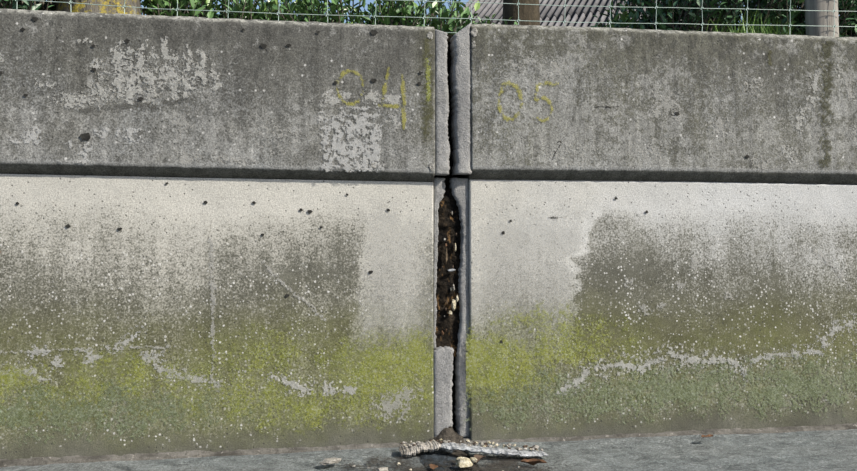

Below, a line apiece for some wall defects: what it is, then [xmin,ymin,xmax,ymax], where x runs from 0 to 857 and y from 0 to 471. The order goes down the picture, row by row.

crack [435,34,461,430]
damp [0,237,222,392]
damp [268,372,357,397]
damp [369,385,423,421]
damp [557,310,857,395]